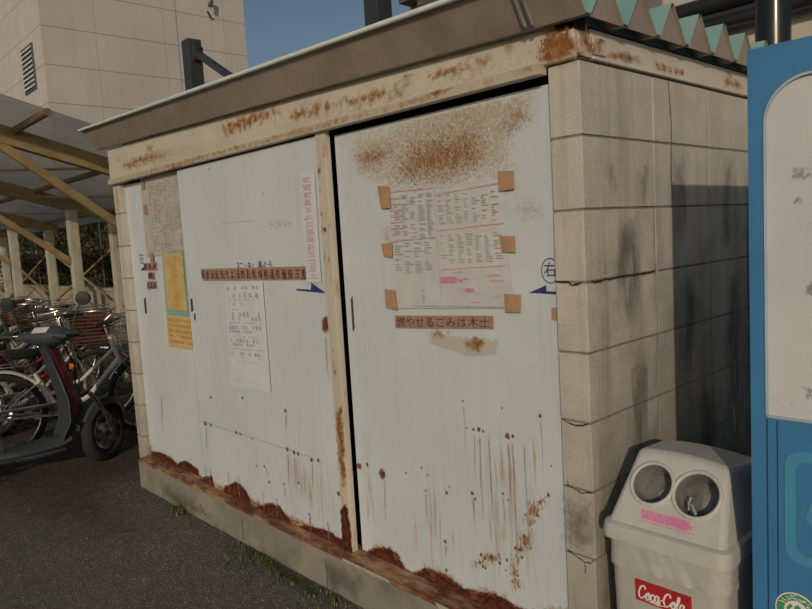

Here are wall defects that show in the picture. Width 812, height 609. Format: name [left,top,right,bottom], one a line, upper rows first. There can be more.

corrosion [535,26,575,63]
corrosion [358,96,532,190]
crack [556,270,655,286]
corrosion [336,408,346,496]
corrosion [150,445,521,609]
corrosion [475,493,550,588]